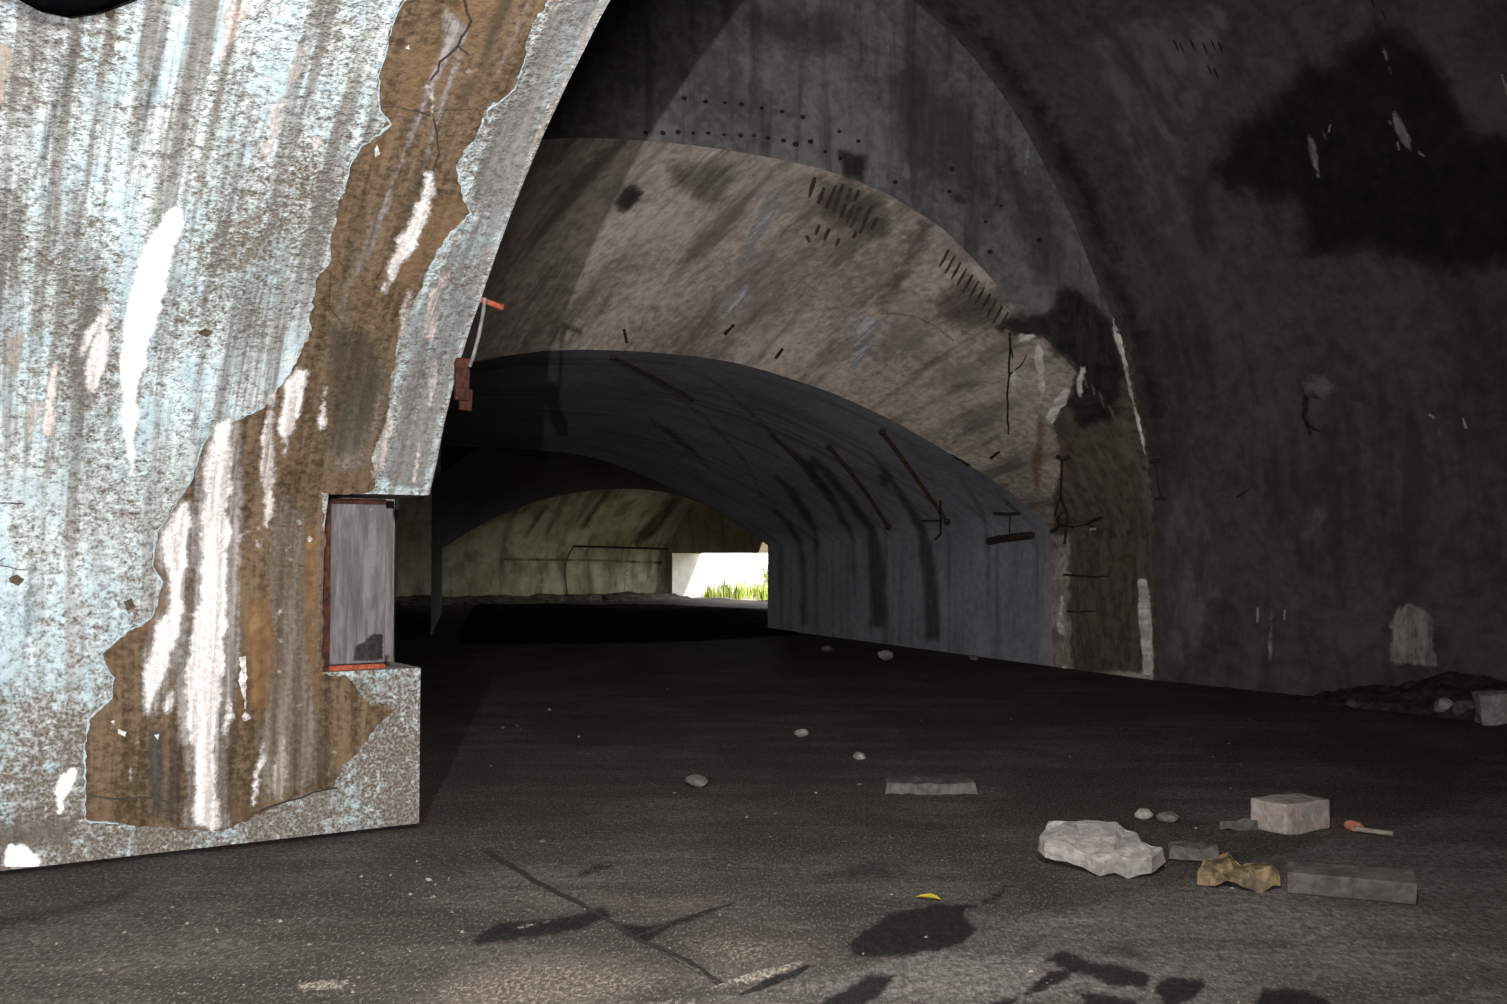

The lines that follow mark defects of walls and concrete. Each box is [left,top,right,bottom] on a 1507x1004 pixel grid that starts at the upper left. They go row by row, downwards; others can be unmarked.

damp [219,0,251,61]
damp [0,42,12,105]
damp [263,50,303,156]
crack [378,0,472,174]
damp [1308,124,1331,177]
damp [1389,113,1425,157]
damp [8,330,24,376]
damp [80,208,185,476]
damp [26,364,58,442]
peeling [0,0,547,854]
damp [938,283,1158,675]